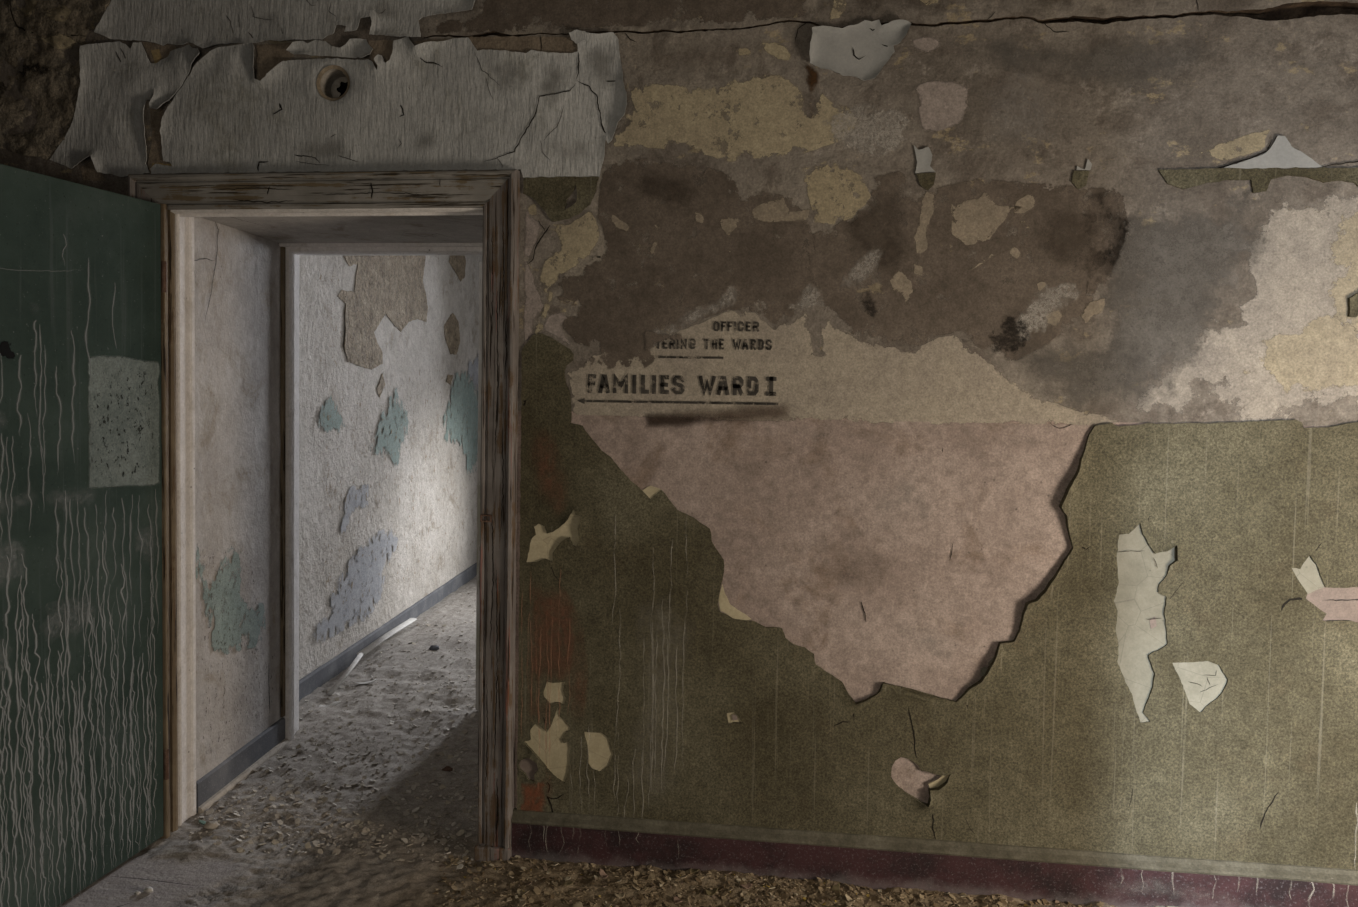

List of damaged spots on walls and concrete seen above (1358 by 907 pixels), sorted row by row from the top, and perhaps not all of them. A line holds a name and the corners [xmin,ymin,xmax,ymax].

crack [423,20,849,49]
peeling [809,20,911,81]
crack [881,0,1358,33]
peeling [0,0,627,346]
crack [1218,142,1271,168]
crack [526,220,549,265]
spalling [337,255,428,397]
peeling [526,509,580,562]
peeling [1281,543,1358,622]
peeling [571,415,1094,840]
peeling [1114,516,1176,722]
peeling [1173,661,1227,712]